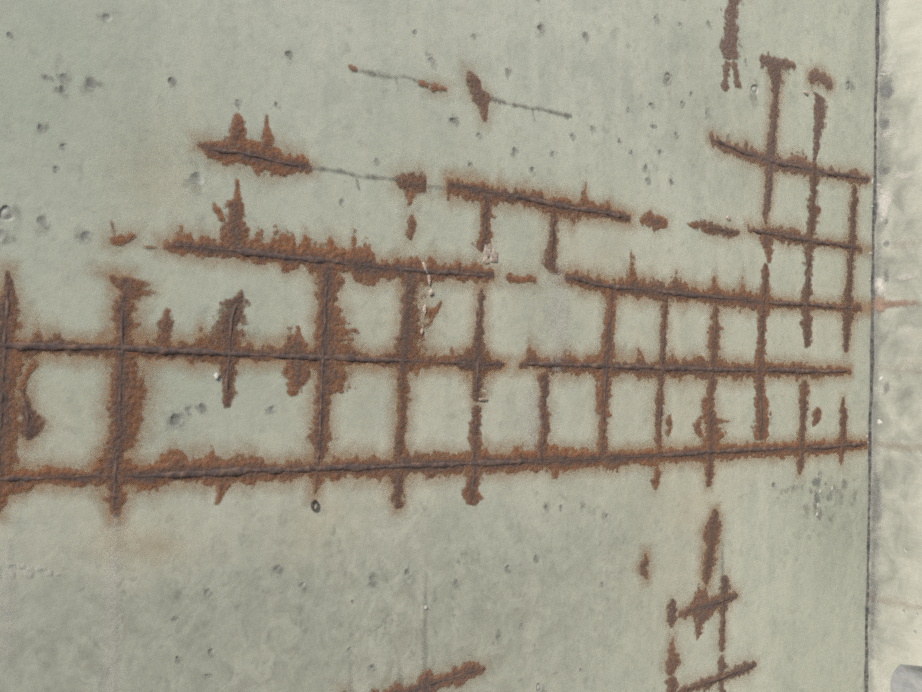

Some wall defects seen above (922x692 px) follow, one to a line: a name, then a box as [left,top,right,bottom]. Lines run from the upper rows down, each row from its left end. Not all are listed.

rust [720,0,742,91]
crack [492,97,571,117]
rust [0,52,908,523]
rust [665,507,757,692]
rust [371,661,485,692]